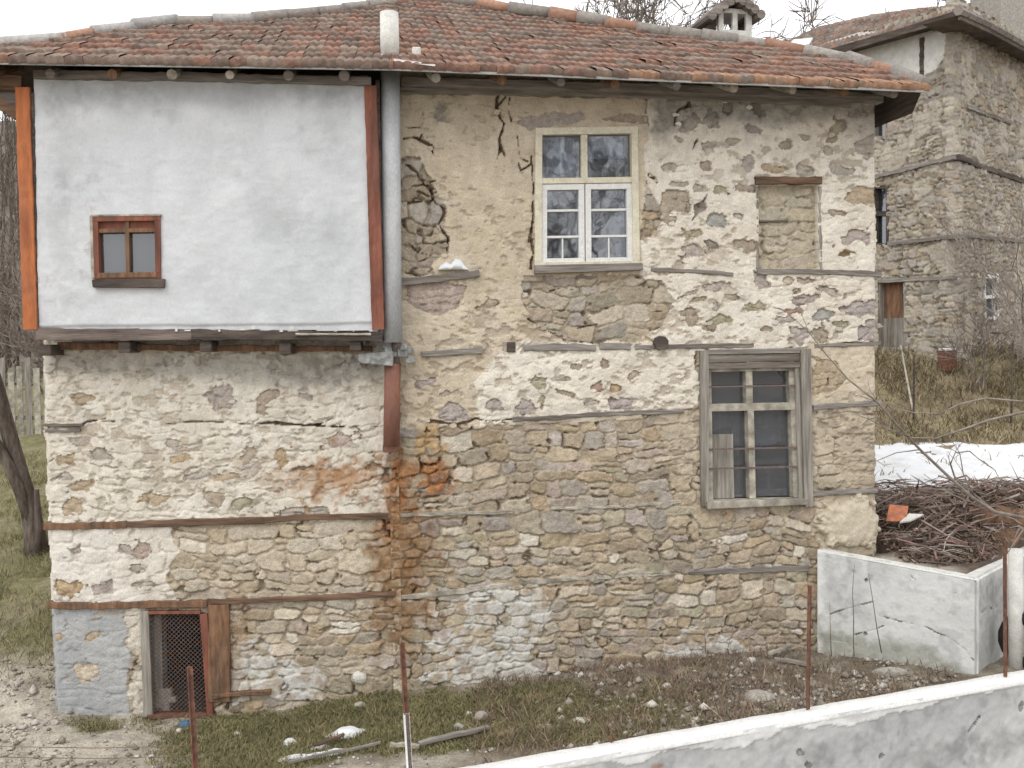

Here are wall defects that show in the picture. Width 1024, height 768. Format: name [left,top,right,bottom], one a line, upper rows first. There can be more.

crack [493,95,534,270]
spalling [401,154,505,316]
spalling [521,270,883,397]
spalling [202,384,237,412]
crack [167,420,374,430]
spalling [414,377,471,424]
corrosion [378,425,449,517]
spalling [118,536,156,590]
crack [830,602,946,636]